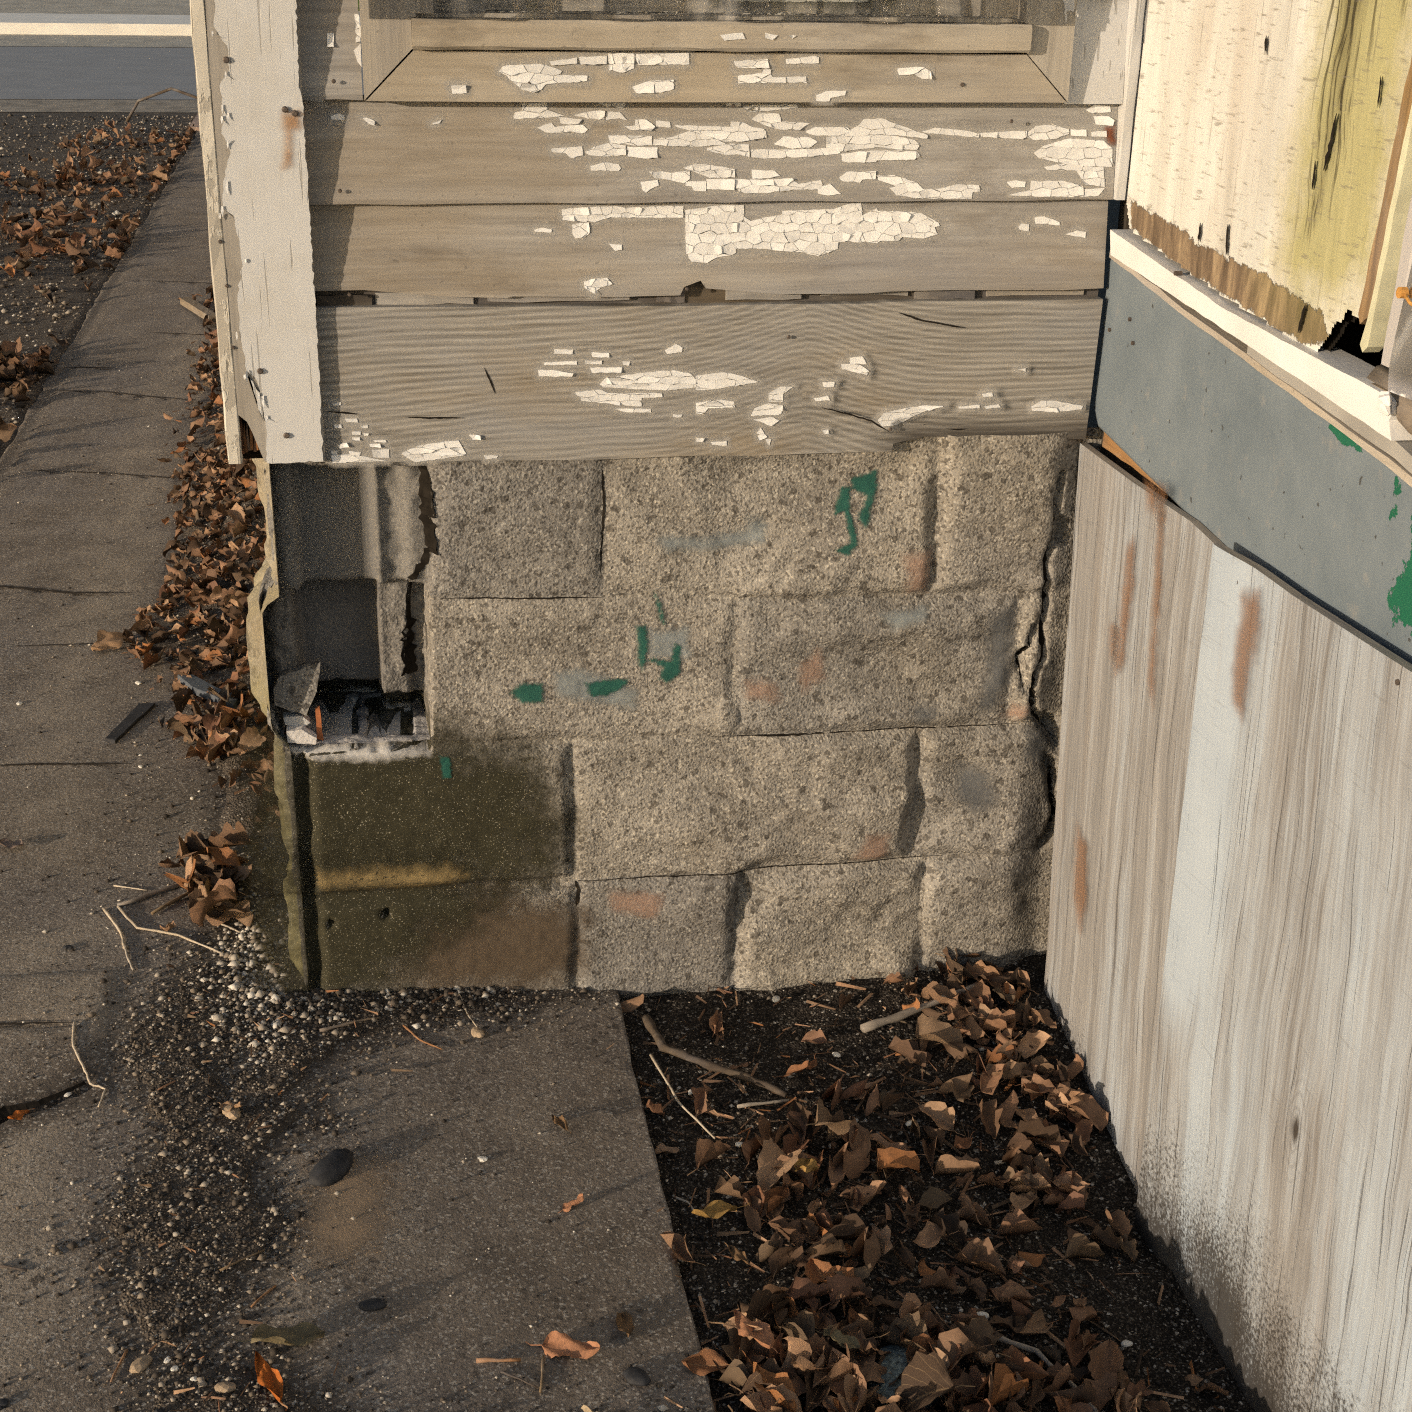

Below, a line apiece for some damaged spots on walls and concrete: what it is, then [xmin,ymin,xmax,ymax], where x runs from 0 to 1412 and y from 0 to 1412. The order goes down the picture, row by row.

peeling [495,32,1117,265]
peeling [535,341,795,448]
peeling [813,354,871,404]
peeling [875,389,1002,429]
peeling [1028,398,1085,415]
spalling [273,657,324,744]
crack [400,463,605,676]
crack [708,497,1056,822]
rust [1112,547,1133,666]
rust [1235,599,1257,710]
leakage [256,679,586,994]
crack [0,1081,86,1120]